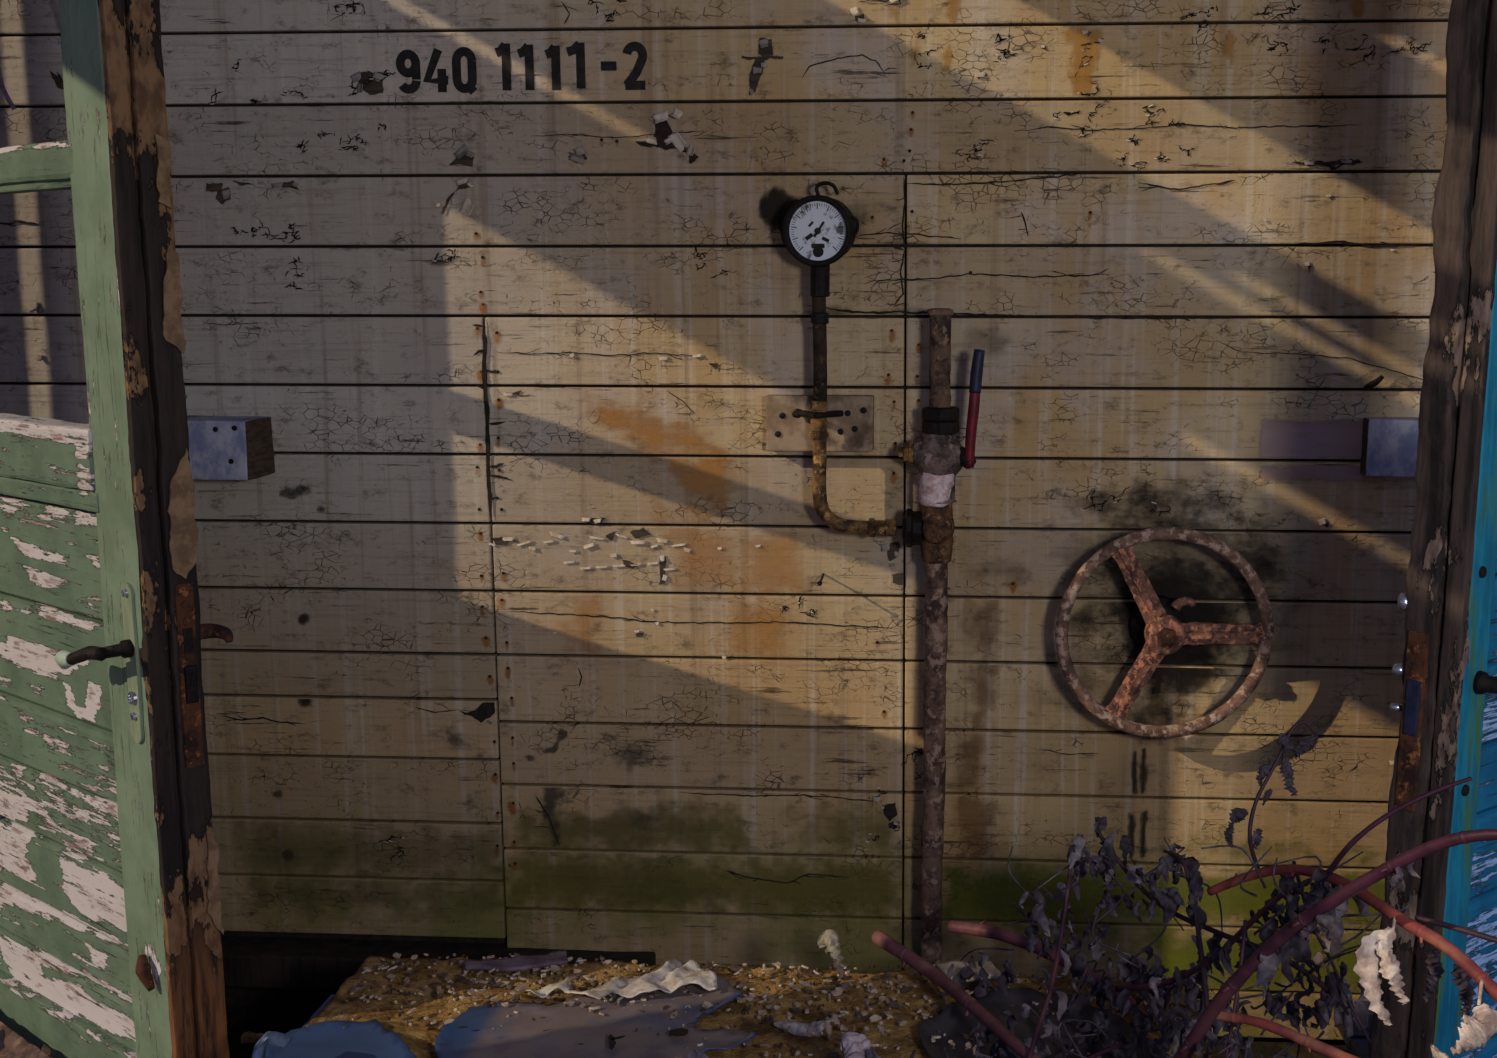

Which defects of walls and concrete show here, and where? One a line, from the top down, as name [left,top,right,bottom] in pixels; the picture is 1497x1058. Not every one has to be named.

crack [993,33,1017,63]
crack [1180,4,1218,33]
crack [1255,0,1432,60]
crack [536,130,706,138]
crack [806,38,1435,380]
crack [692,247,737,279]
peeling [162,245,186,354]
rust [598,407,727,509]
leakage [1132,748,1147,793]
leakage [1128,811,1148,857]